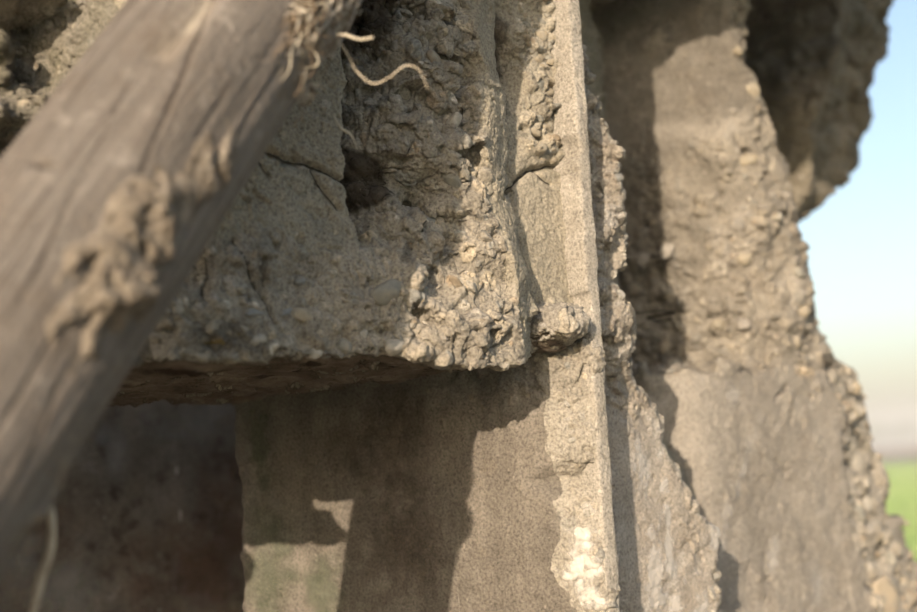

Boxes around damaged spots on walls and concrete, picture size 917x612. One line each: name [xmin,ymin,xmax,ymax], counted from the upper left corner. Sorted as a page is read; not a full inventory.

spalling [0,0,118,151]
crack [259,152,337,209]
crack [505,166,553,191]
spalling [134,0,621,612]
spalling [582,0,917,612]